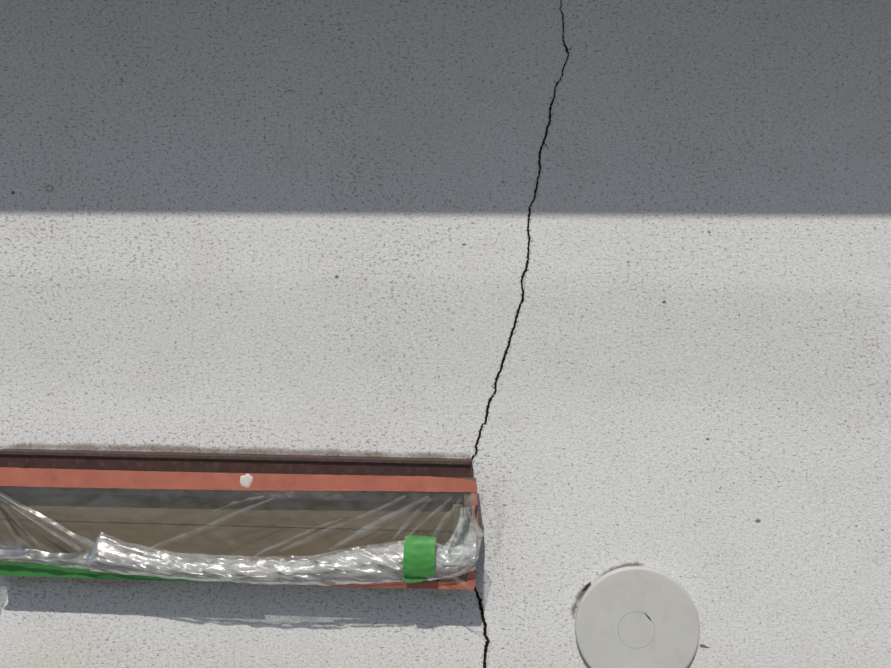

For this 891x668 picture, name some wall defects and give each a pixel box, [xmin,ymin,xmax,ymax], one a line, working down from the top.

crack [471,1,572,473]
crack [474,585,492,668]